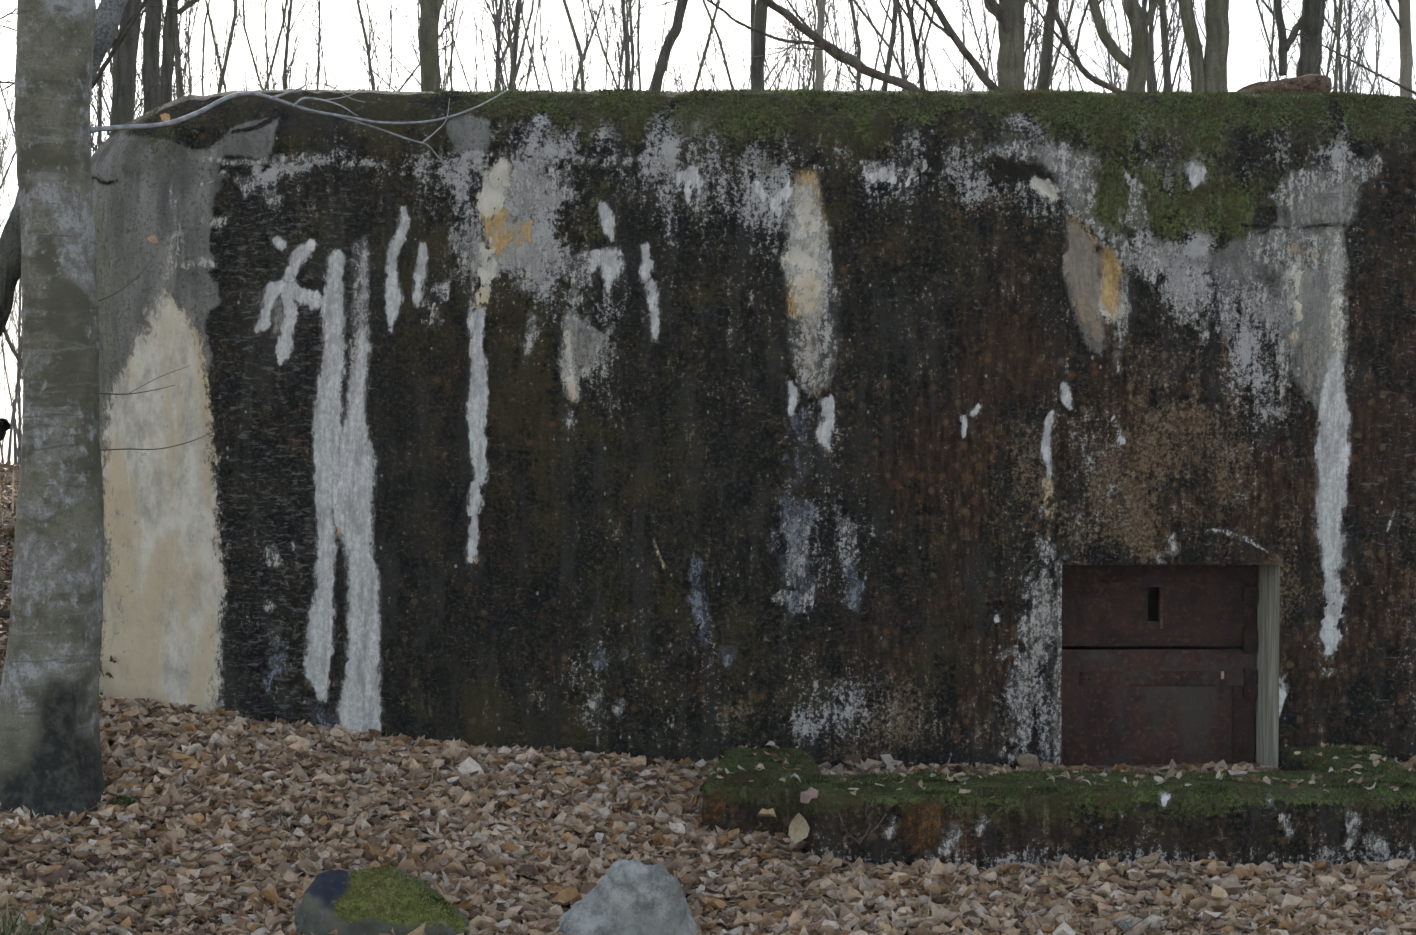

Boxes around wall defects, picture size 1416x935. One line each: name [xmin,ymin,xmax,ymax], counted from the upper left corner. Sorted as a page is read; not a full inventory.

peeling [99,287,228,710]
water stain [261,153,321,164]
water stain [255,238,381,733]
water stain [385,152,706,563]
water stain [686,554,735,668]
water stain [771,407,816,619]
water stain [843,563,865,611]
water stain [813,159,977,191]
water stain [996,536,1062,764]
spalling [1029,175,1060,202]
spalling [1063,216,1105,348]
water stain [984,139,1383,677]